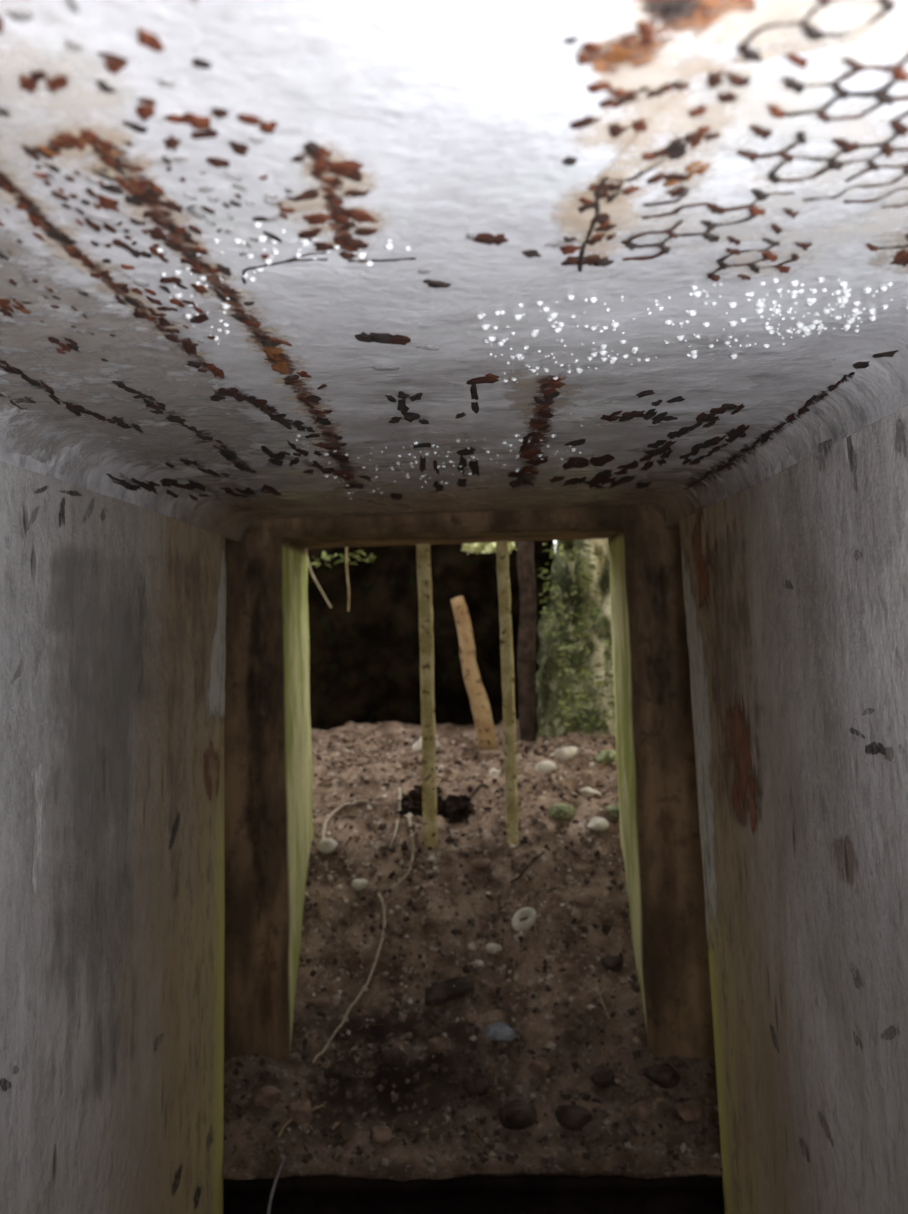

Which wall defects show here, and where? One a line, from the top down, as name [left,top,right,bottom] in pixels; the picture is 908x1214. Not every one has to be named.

spalling [562,0,890,198]
corrosion [0,127,383,489]
corrosion [455,350,899,605]
corrosion [725,698,760,832]